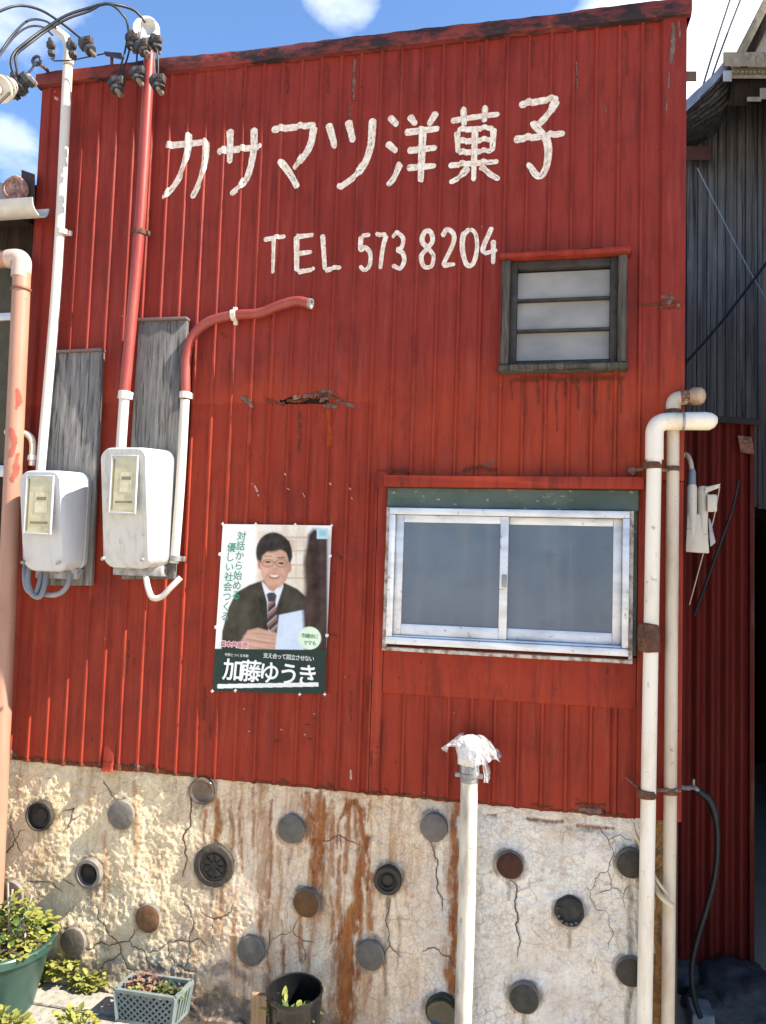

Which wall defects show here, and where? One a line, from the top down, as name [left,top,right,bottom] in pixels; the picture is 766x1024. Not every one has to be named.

peeling [293,393,355,409]
rust [478,802,627,818]
crack [86,798,233,977]
rust [203,780,460,1024]
crack [429,841,443,910]
crack [510,880,521,957]
crack [586,829,631,951]